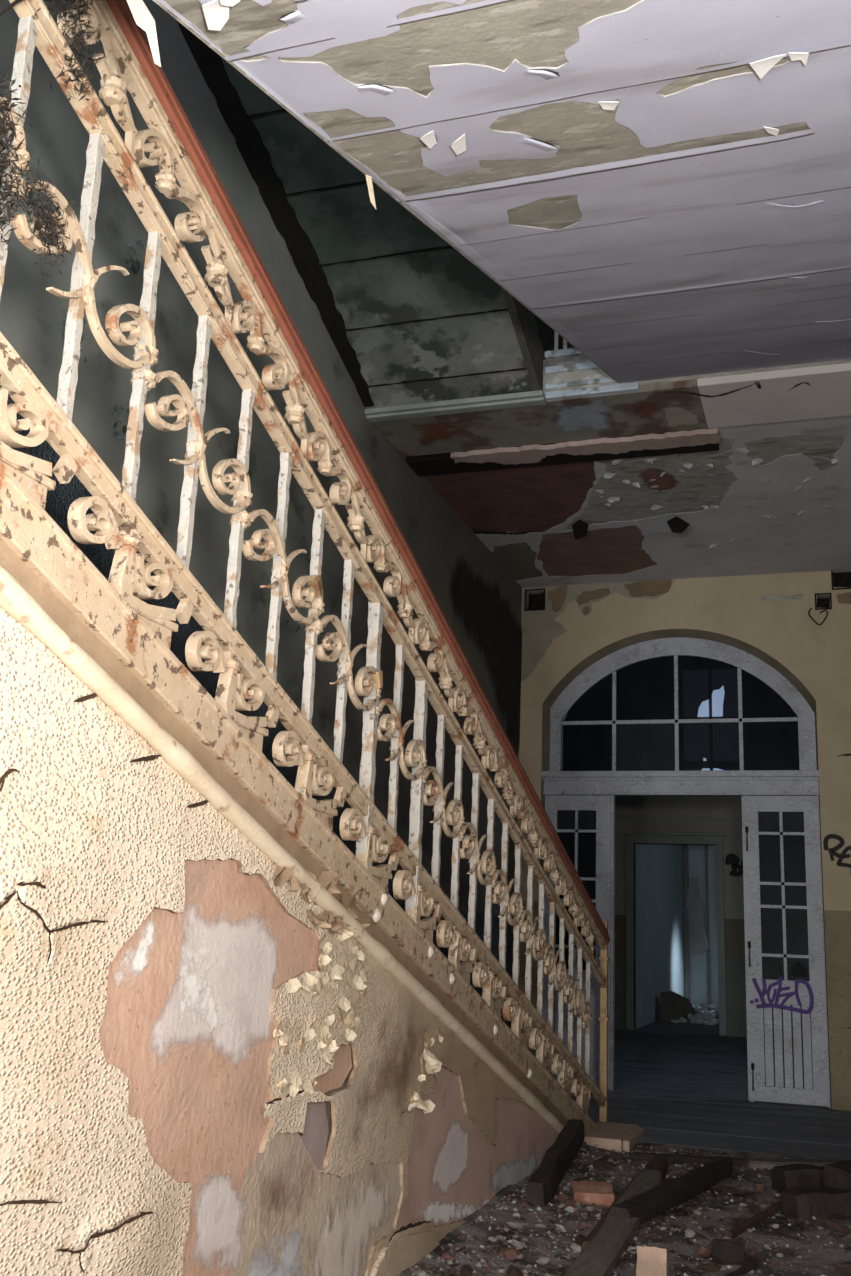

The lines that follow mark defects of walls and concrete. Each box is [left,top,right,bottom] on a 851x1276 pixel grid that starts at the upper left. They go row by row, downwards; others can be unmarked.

peeling [127,0,161,67]
peeling [164,0,641,97]
peeling [657,52,809,96]
peeling [305,99,810,209]
peeling [507,195,582,229]
peeling [450,428,851,682]
crack [0,768,20,805]
crack [0,862,108,977]
spalling [99,859,559,1276]
crack [0,1188,154,1273]